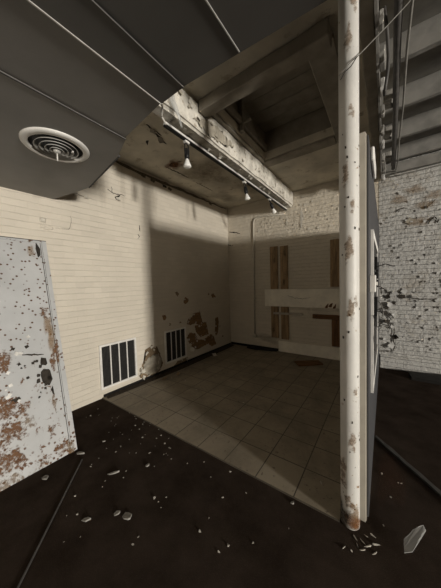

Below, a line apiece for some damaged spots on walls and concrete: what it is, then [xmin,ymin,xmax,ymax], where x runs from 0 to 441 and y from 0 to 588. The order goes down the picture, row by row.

peeling [169,116,289,206]
corrosion [0,353,11,373]
corrosion [40,307,60,371]
peeling [180,311,223,351]
flaking render [379,286,421,352]
corrosion [0,396,34,492]
corrosion [340,496,360,529]